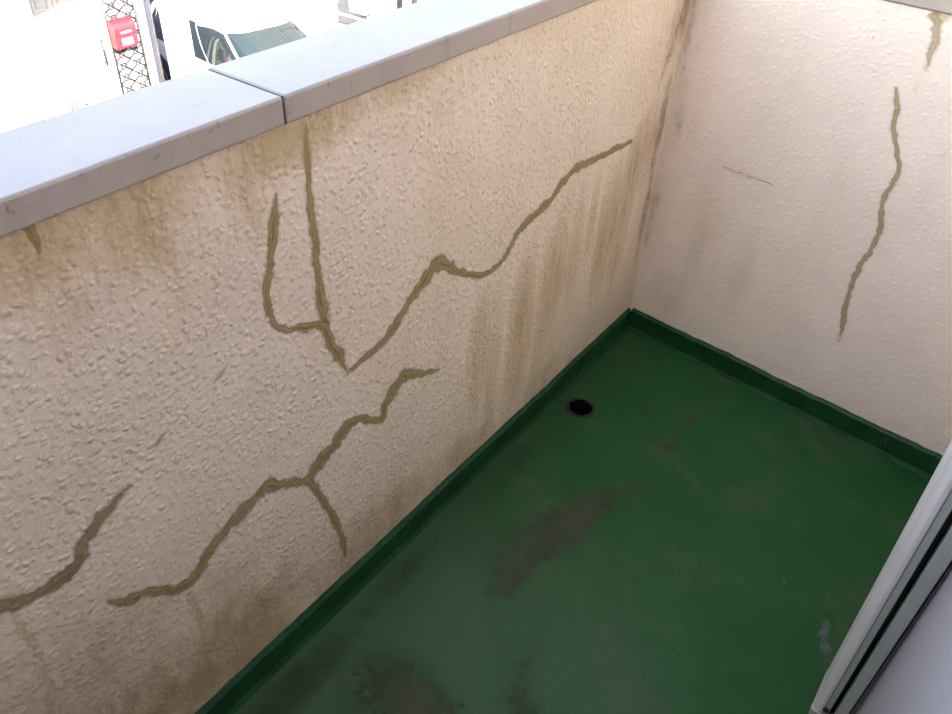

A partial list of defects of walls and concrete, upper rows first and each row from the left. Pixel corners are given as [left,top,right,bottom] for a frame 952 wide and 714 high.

crack [263,124,632,373]
crack [840,86,902,334]
crack [0,484,132,613]
crack [107,369,440,607]